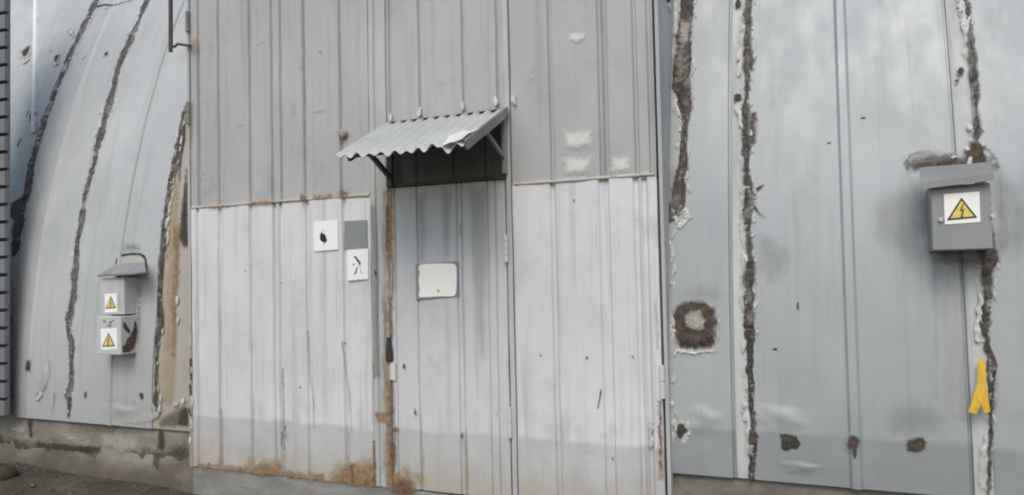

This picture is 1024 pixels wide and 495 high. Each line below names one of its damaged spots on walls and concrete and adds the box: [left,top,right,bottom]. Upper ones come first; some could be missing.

crack [115,253,147,268]
corrosion [171,226,179,355]
corrosion [385,190,393,335]
peeling [669,208,692,291]
peeling [670,313,720,357]
corrosion [160,407,185,426]
corrosion [197,382,415,495]
peeling [648,401,691,468]